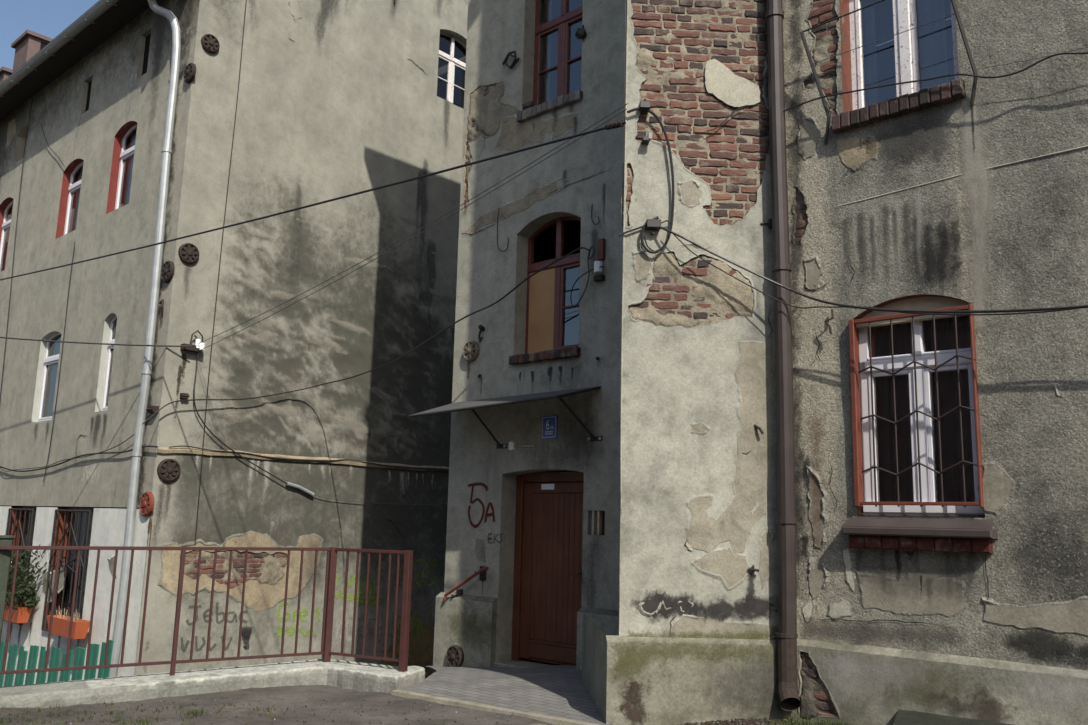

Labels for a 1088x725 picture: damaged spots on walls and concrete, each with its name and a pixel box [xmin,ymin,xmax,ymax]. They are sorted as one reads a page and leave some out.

water stain [318,0,337,32]
spalling [802,0,845,116]
spalling [629,0,770,227]
spalling [461,81,580,235]
water stain [417,160,436,296]
water stain [845,205,918,264]
spalling [621,247,756,329]
water stain [249,458,269,484]
peeling [685,340,777,591]
peeling [157,530,324,611]
water stain [1006,629,1088,656]
water stain [620,681,646,725]